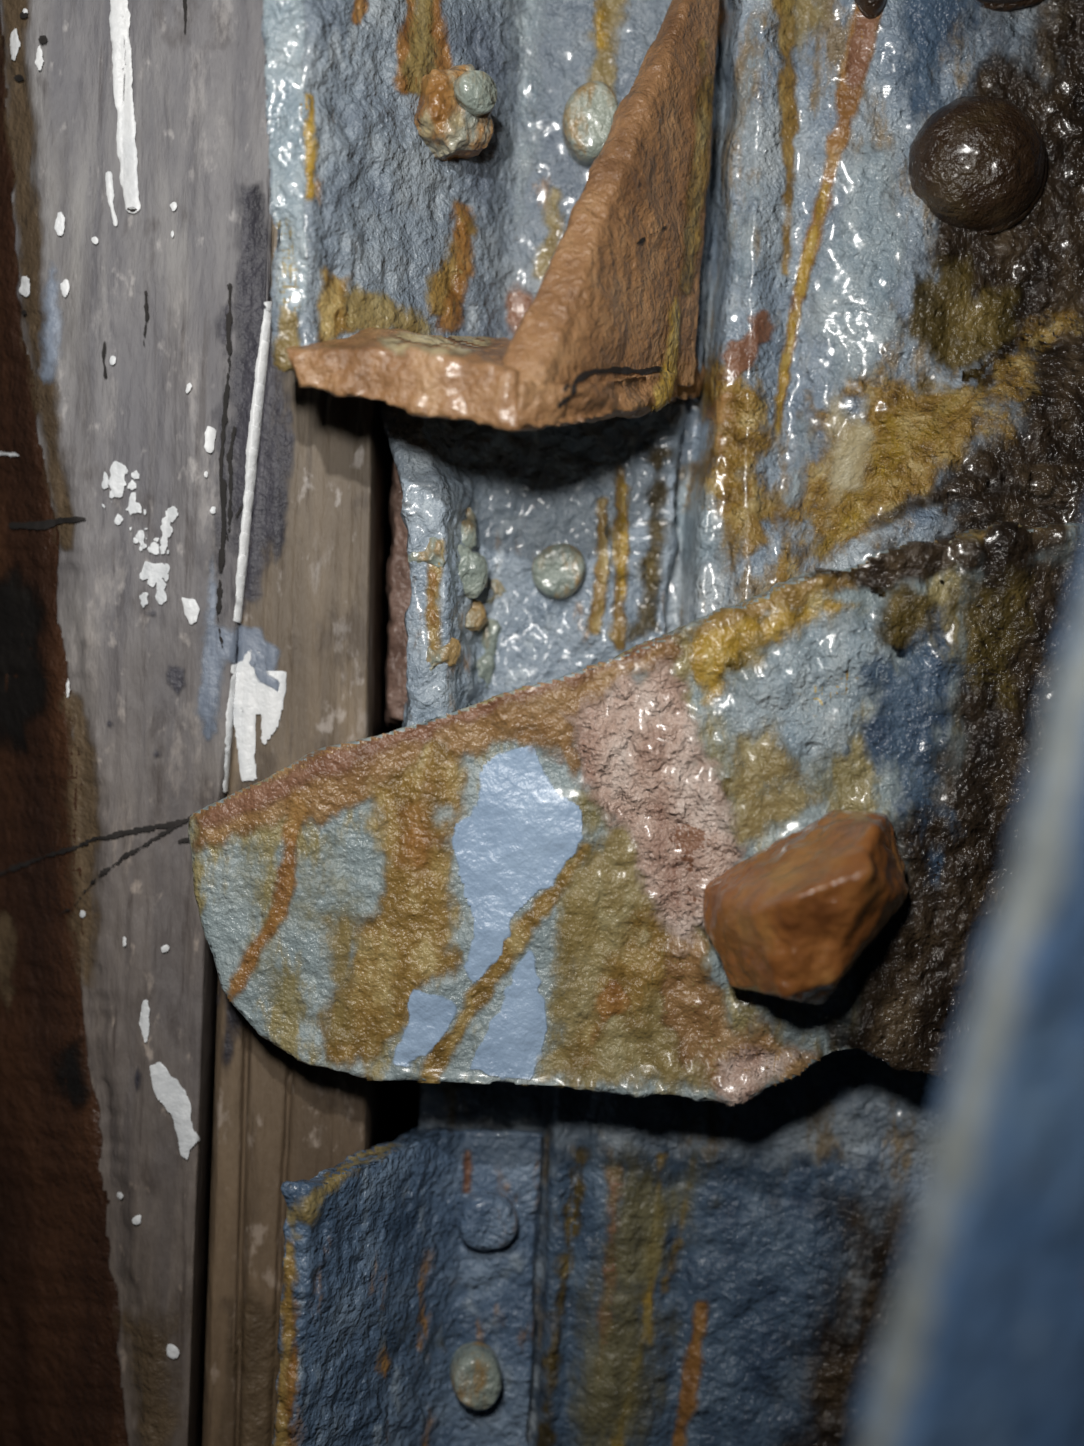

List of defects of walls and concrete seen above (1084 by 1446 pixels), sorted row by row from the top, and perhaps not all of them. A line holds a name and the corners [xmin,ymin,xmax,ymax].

corrosion [193,0,1084,1107]
corrosion [231,1143,394,1446]
corrosion [463,1150,472,1193]
corrosion [537,1331,559,1446]
corrosion [556,1148,588,1314]
corrosion [599,1166,622,1343]
corrosion [642,1246,678,1343]
corrosion [673,1302,708,1446]
corrosion [782,1197,917,1446]